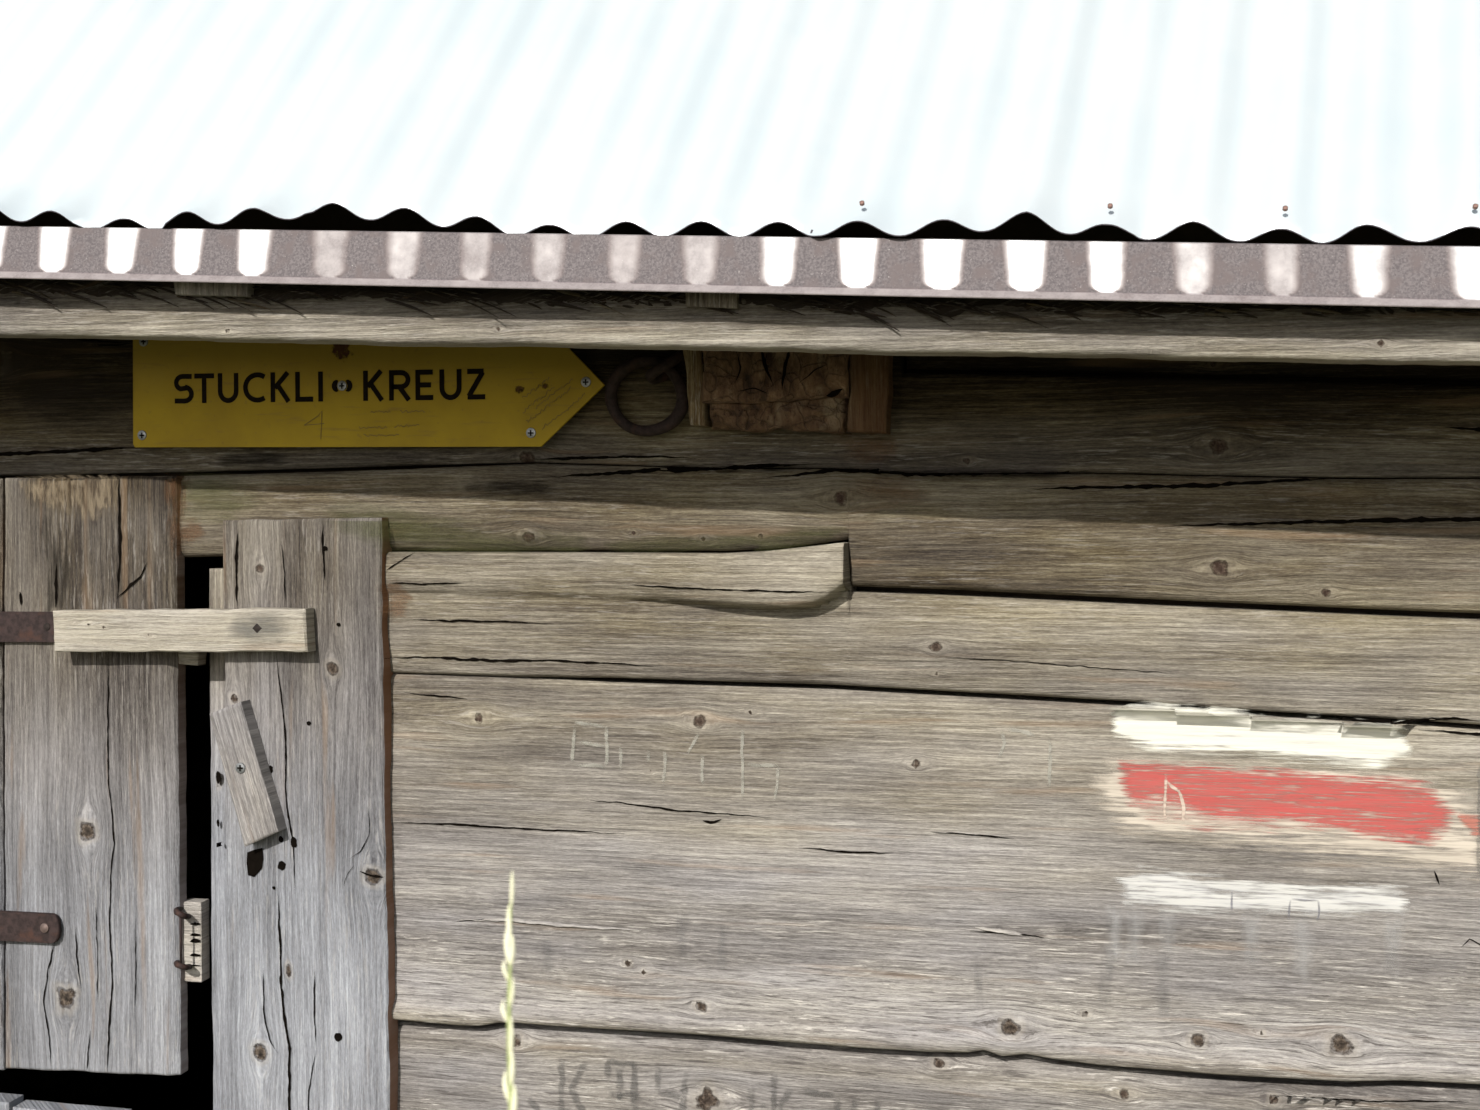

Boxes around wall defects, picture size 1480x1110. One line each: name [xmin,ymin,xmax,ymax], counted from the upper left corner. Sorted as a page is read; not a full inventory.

crack [540,455,1332,490]
crack [1174,516,1480,526]